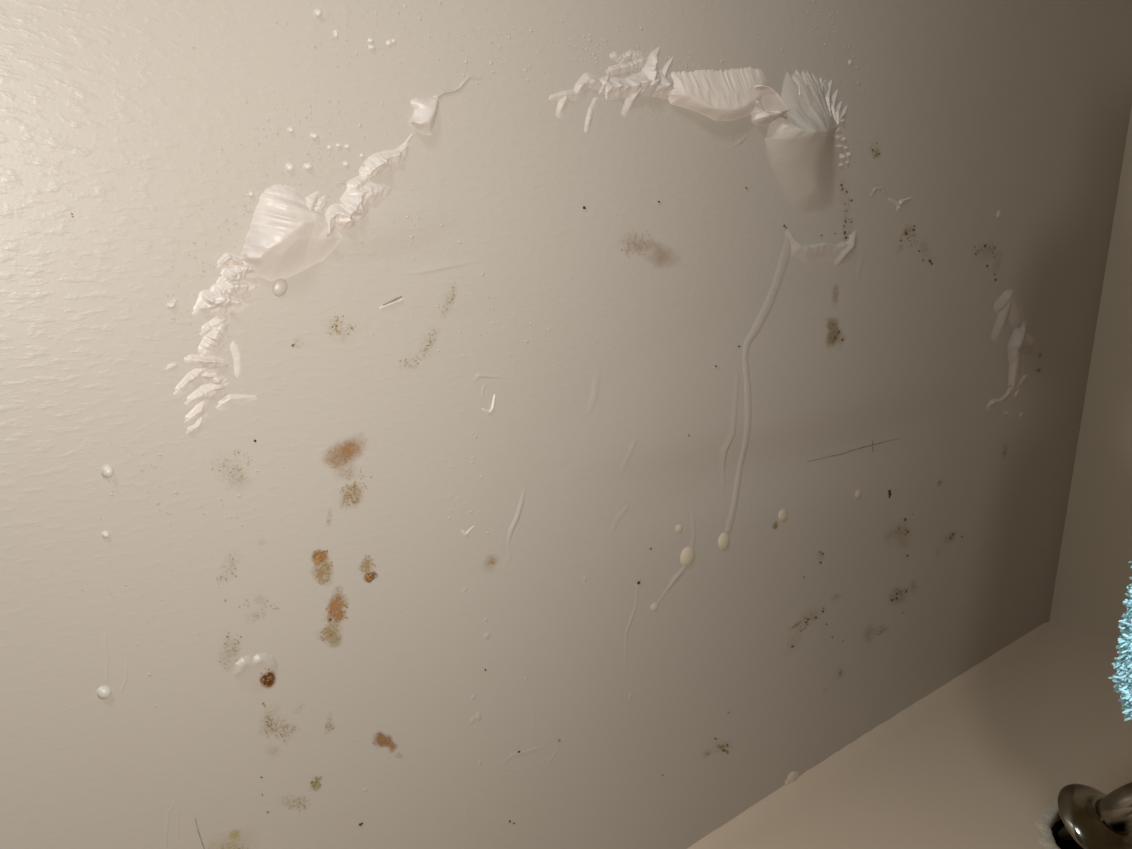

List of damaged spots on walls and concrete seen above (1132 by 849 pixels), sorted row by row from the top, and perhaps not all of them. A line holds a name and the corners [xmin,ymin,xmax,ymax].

peeling [783,225,859,267]
peeling [986,289,1034,418]
rust [327,443,372,508]
rust [312,550,333,583]
rust [361,555,376,582]
rust [320,595,349,647]
rust [260,668,276,687]
rust [373,733,395,749]